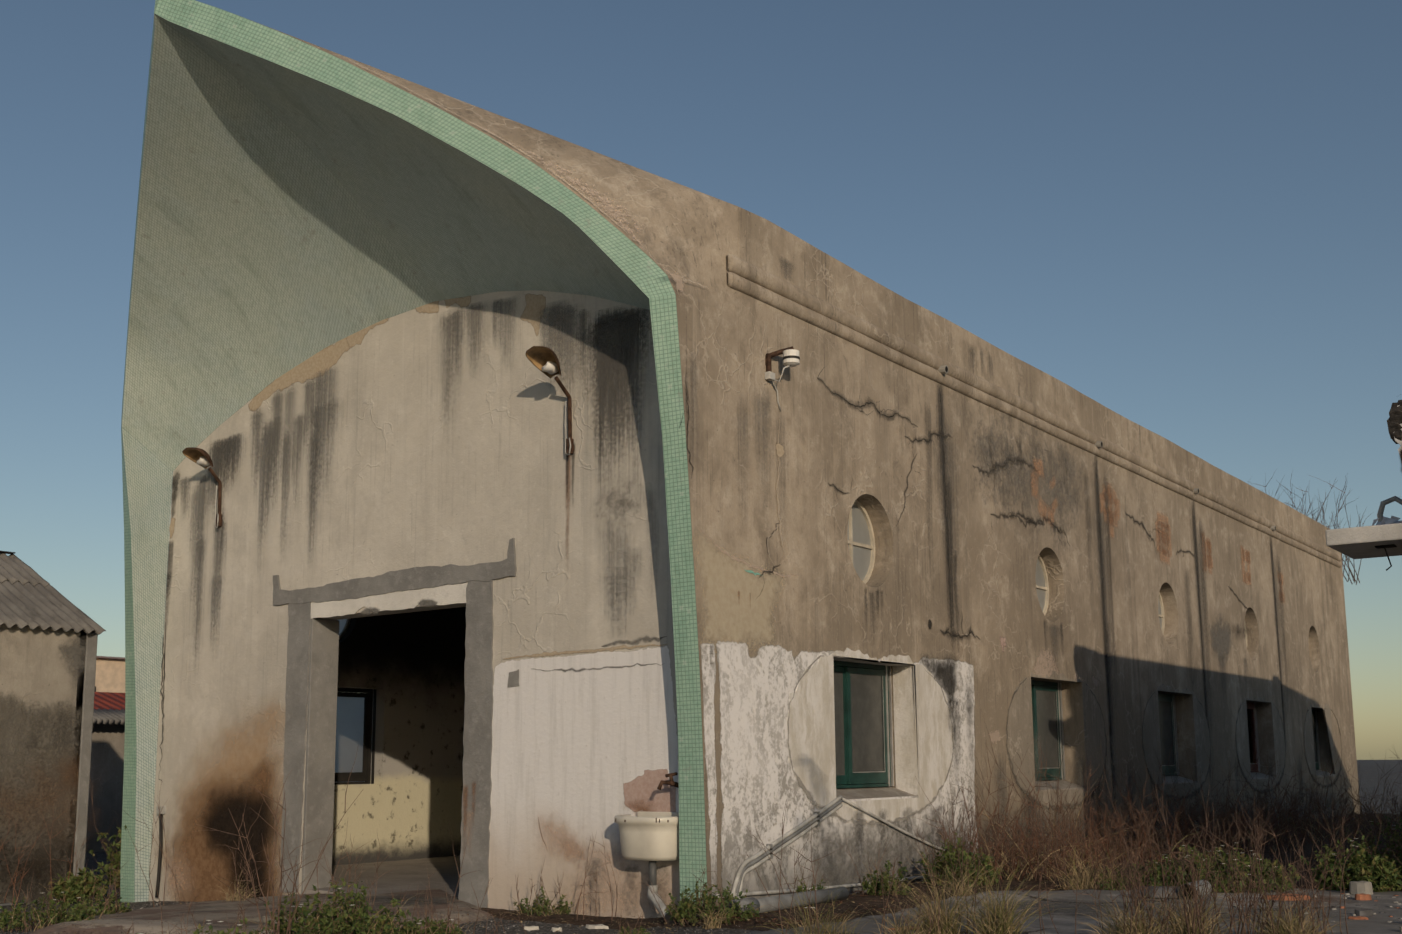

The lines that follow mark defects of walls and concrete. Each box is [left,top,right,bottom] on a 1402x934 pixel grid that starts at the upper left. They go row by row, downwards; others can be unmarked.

water stain [0,697,81,902]
water stain [60,638,86,670]
peeling [698,528,1000,903]
crack [818,369,950,522]
water stain [924,388,971,735]
crack [975,451,1069,544]